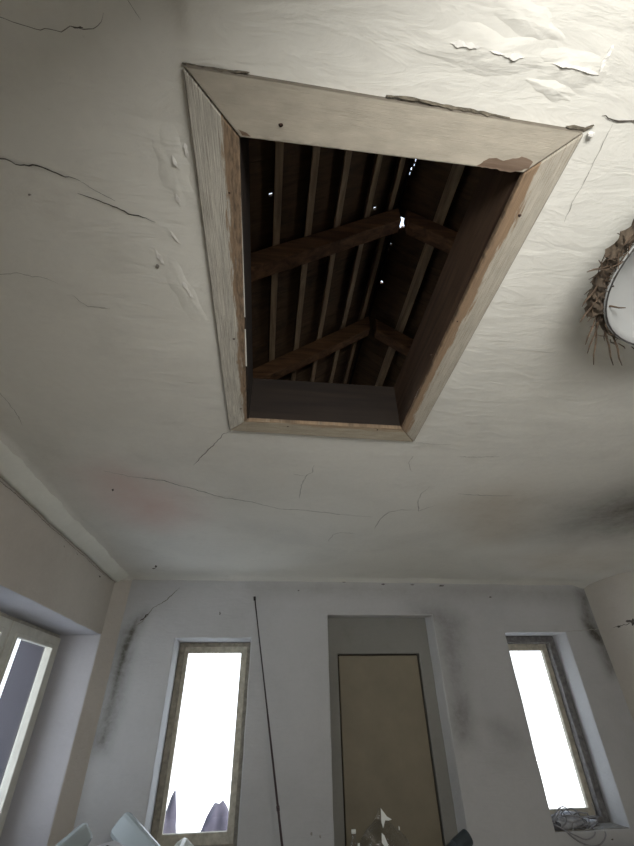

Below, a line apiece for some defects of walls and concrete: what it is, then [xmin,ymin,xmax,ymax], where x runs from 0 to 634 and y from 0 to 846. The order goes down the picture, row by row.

crack [0,17,103,32]
flaking render [451,39,524,61]
flaking render [552,45,614,75]
crack [0,158,154,222]
crack [564,115,634,222]
damp [235,459,634,687]
damp [88,600,158,765]